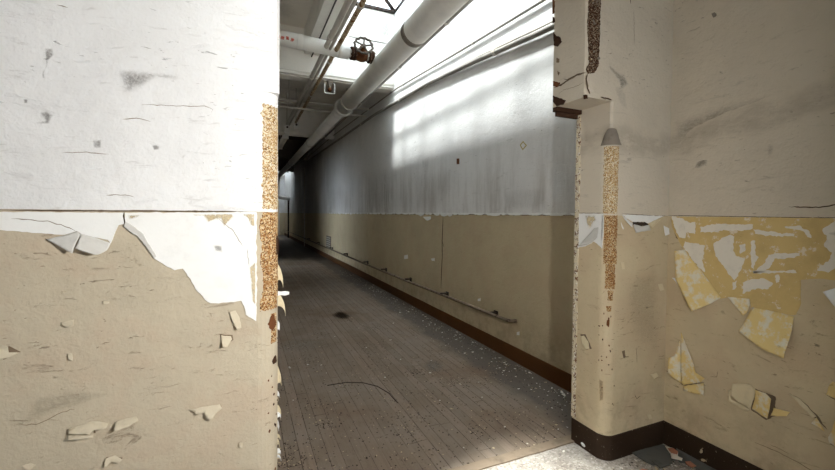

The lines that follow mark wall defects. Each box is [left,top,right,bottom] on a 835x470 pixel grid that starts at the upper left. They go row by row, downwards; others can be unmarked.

spalling [552,0,562,47]
spalling [553,58,566,106]
crack [554,72,611,100]
peeling [0,103,289,348]
peeling [329,128,835,315]
crack [782,204,835,218]
peeling [67,416,138,440]